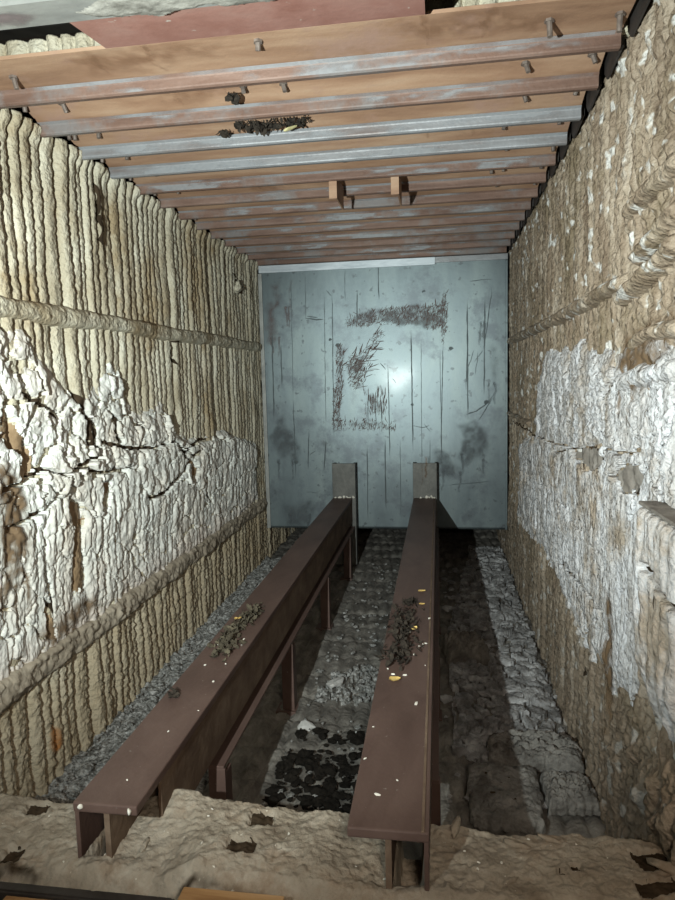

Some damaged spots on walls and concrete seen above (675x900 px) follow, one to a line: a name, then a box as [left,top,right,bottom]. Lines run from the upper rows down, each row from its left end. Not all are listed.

leakage [617,338,666,425]
crack [11,392,209,499]
crack [511,421,641,454]
leakage [0,466,30,620]
leakage [45,601,95,646]
leakage [602,599,613,719]